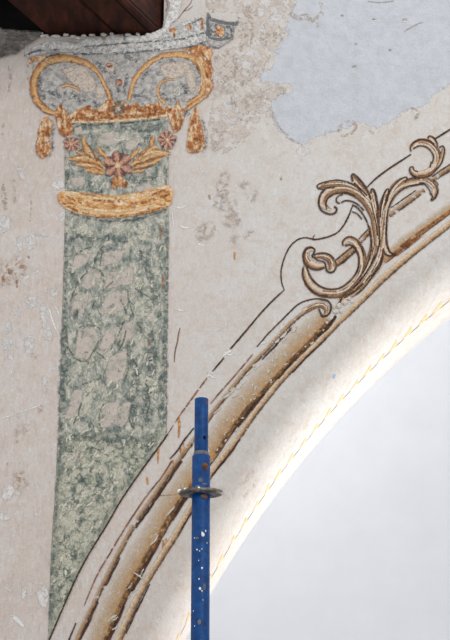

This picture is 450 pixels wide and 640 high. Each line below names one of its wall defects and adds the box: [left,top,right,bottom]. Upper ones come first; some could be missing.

peeling [241,0,450,156]